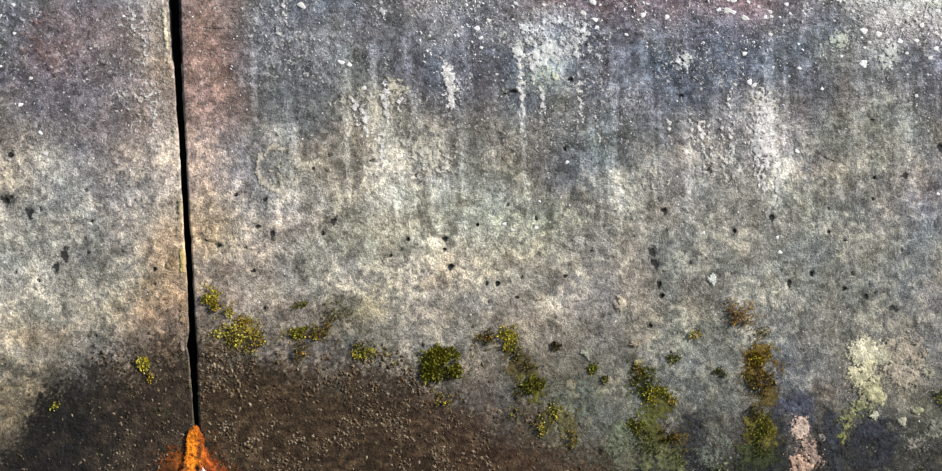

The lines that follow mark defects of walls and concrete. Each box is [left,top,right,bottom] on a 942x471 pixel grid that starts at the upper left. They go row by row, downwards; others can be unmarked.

leakage [254,0,304,46]
leakage [494,9,614,150]
leakage [665,50,701,73]
leakage [329,51,466,189]
leakage [616,156,674,194]
leakage [687,83,786,212]
corrosion [153,425,238,471]
leakage [0,316,716,471]
leakage [728,393,942,471]